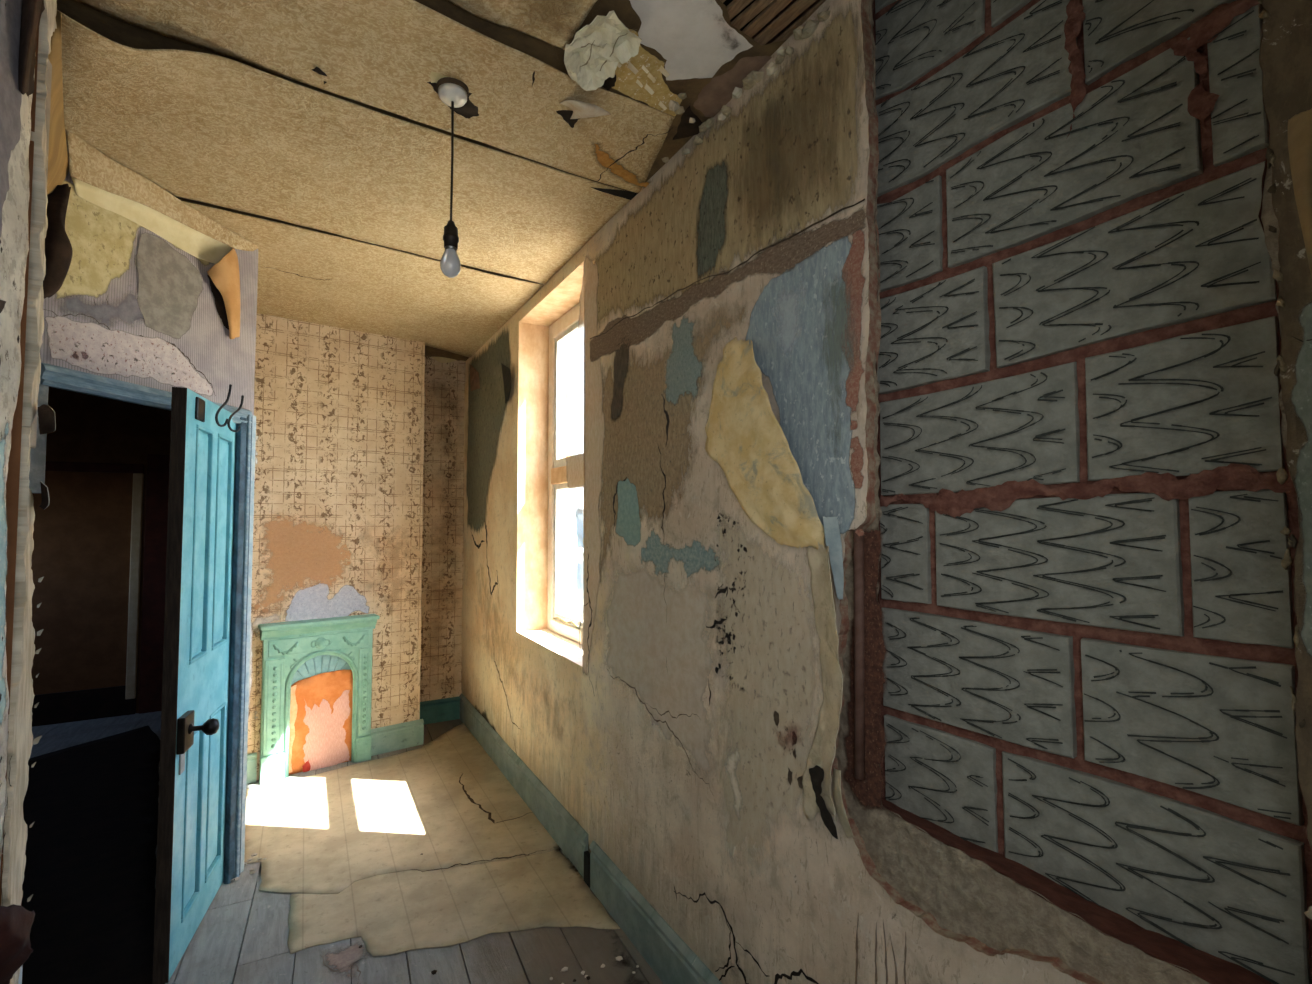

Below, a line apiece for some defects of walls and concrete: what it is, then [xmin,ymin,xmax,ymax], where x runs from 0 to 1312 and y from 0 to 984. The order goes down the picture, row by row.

peeling [0,0,45,253]
peeling [556,100,610,128]
crack [590,128,672,183]
flaking render [629,0,772,140]
peeling [0,417,9,723]
peeling [466,328,512,532]
flaking render [563,257,604,674]
peeling [616,478,719,578]
peeling [664,316,702,406]
flaking render [745,0,1273,984]
flaking render [1258,0,1312,849]
crack [674,886,819,984]